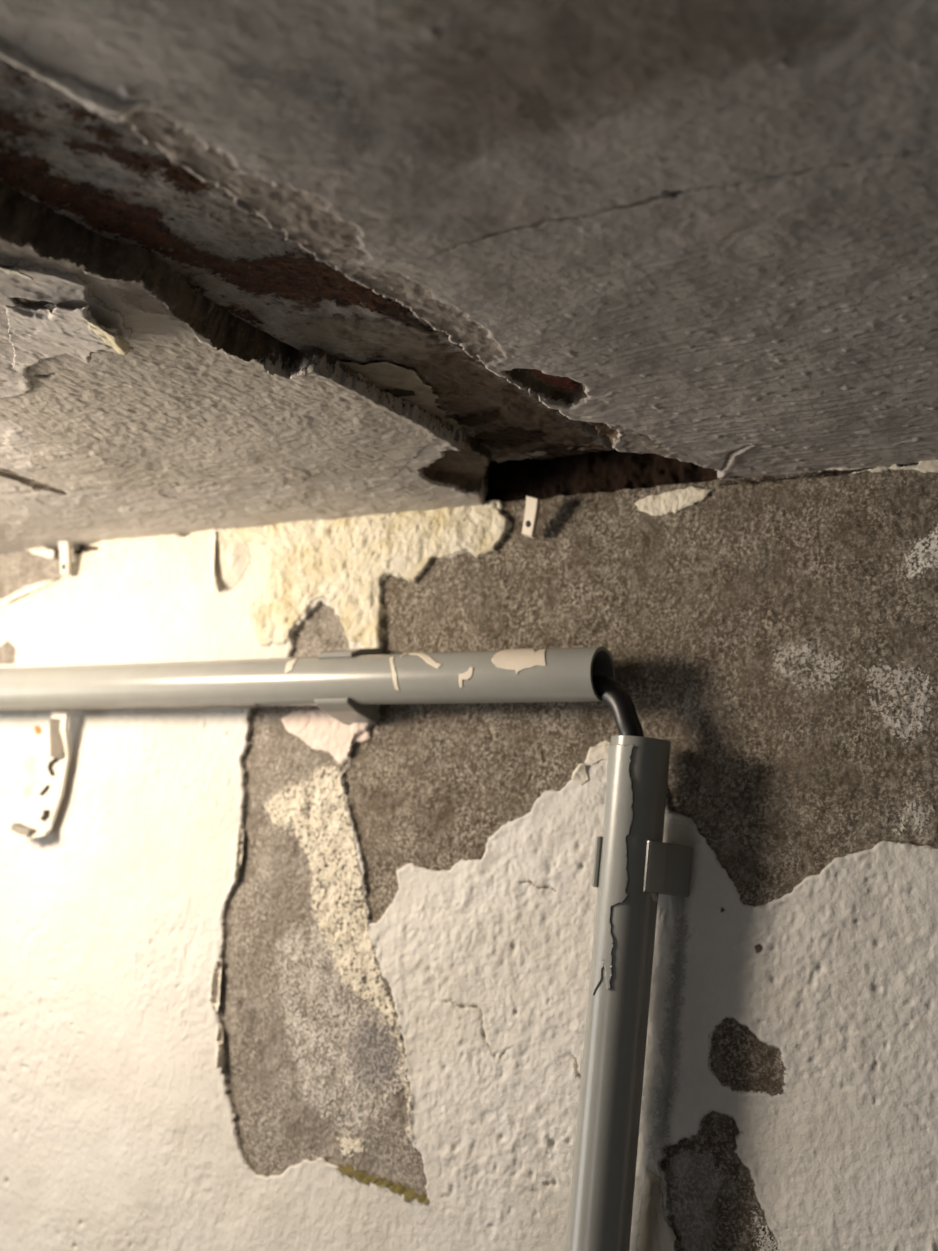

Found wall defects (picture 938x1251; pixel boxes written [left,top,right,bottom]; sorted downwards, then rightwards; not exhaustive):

corrosion [0,104,607,460]
peeling [121,102,587,405]
crack [454,178,764,248]
flaking render [0,181,938,906]
flaking render [209,702,620,1205]
flaking render [654,1111,783,1251]
flaking render [708,1016,786,1096]